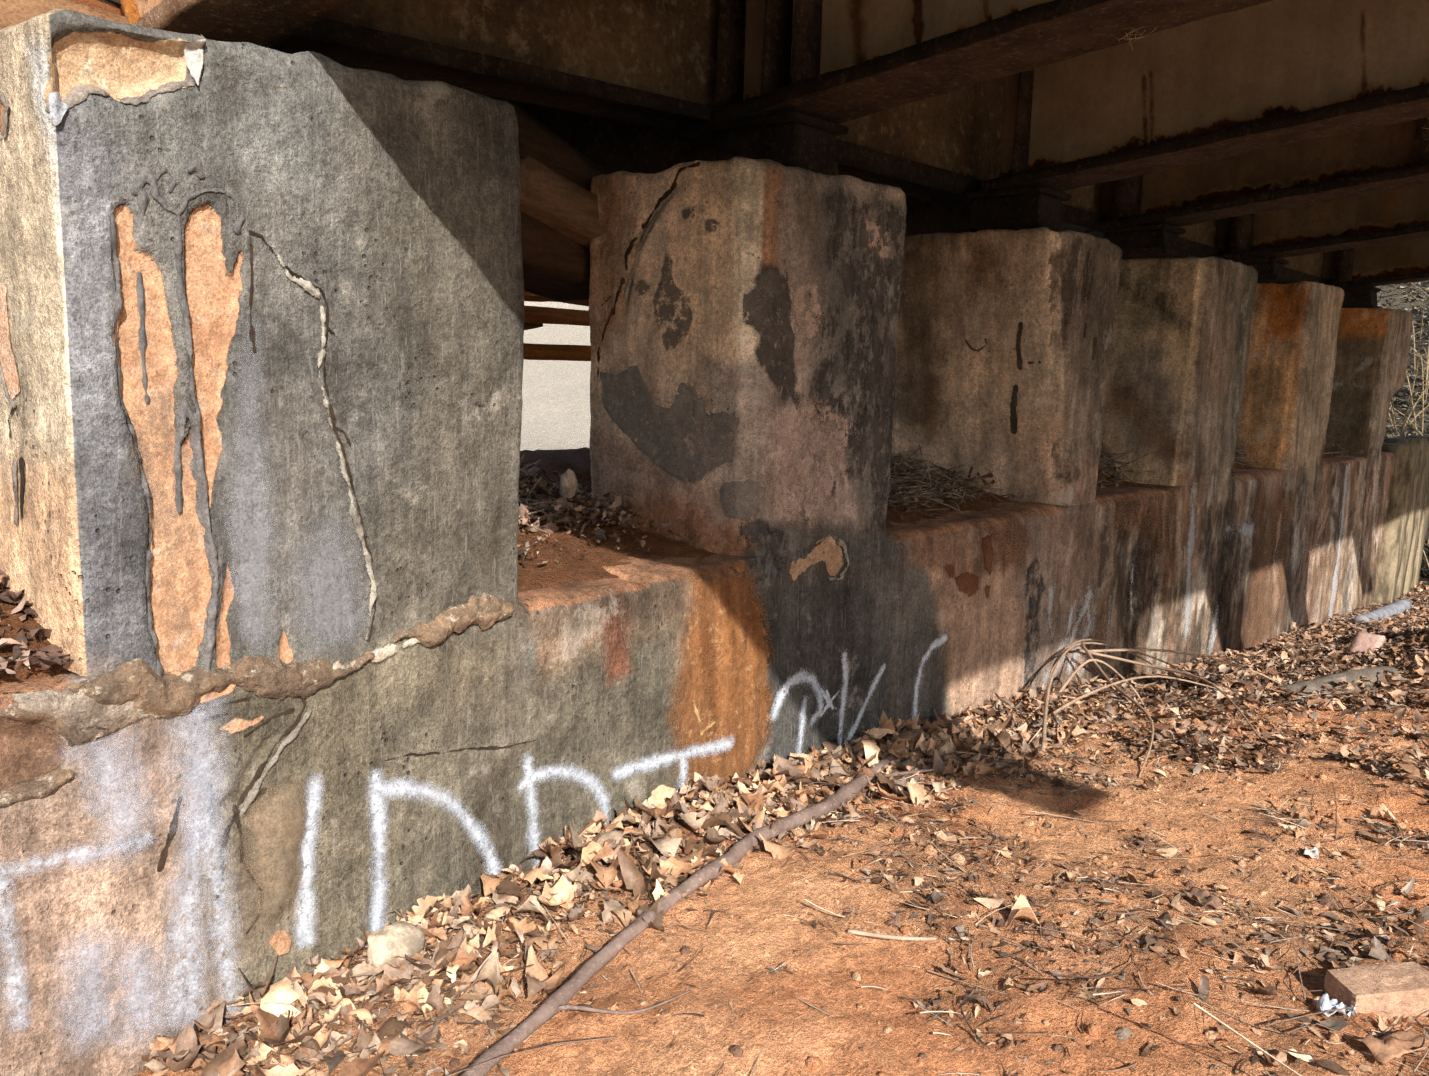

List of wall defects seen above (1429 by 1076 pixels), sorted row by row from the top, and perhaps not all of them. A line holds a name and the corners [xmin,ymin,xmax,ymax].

spalling [42,32,206,126]
rust [912,0,924,44]
spalling [0,159,514,808]
crack [248,230,377,641]
crack [597,162,701,384]
rust [670,561,772,793]
spalling [789,535,849,581]
leakage [737,187,907,581]
leakage [945,526,1092,692]
leakage [1184,489,1254,655]
leakage [1296,465,1348,620]
crack [157,695,313,934]